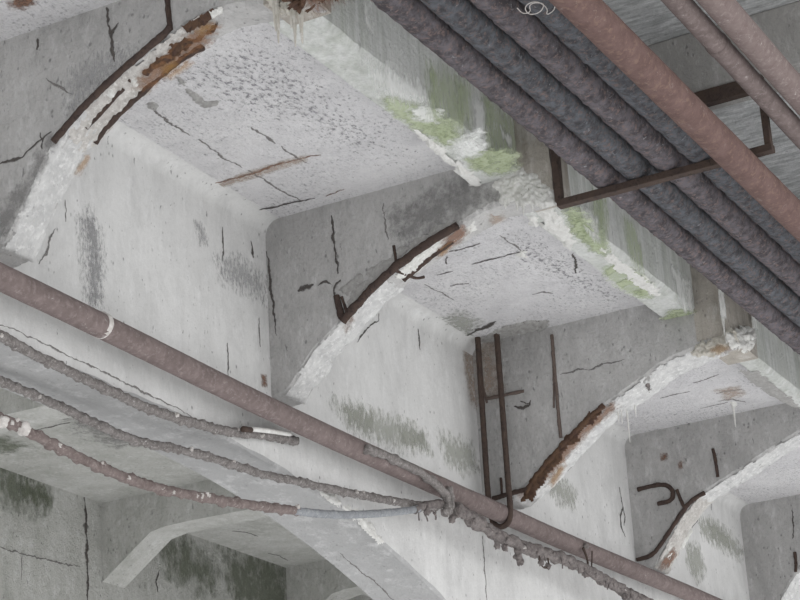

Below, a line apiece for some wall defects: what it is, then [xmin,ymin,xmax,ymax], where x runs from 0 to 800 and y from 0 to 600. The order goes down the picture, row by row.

crack [106,7,118,62]
spalling [1,0,224,262]
rust [141,25,218,88]
crack [153,108,344,210]
water stain [186,41,387,152]
water stain [370,61,661,297]
crack [251,242,276,347]
crack [298,215,341,295]
peeling [285,218,477,404]
peeling [480,320,729,504]
crack [1,497,89,600]
spalling [636,435,800,574]